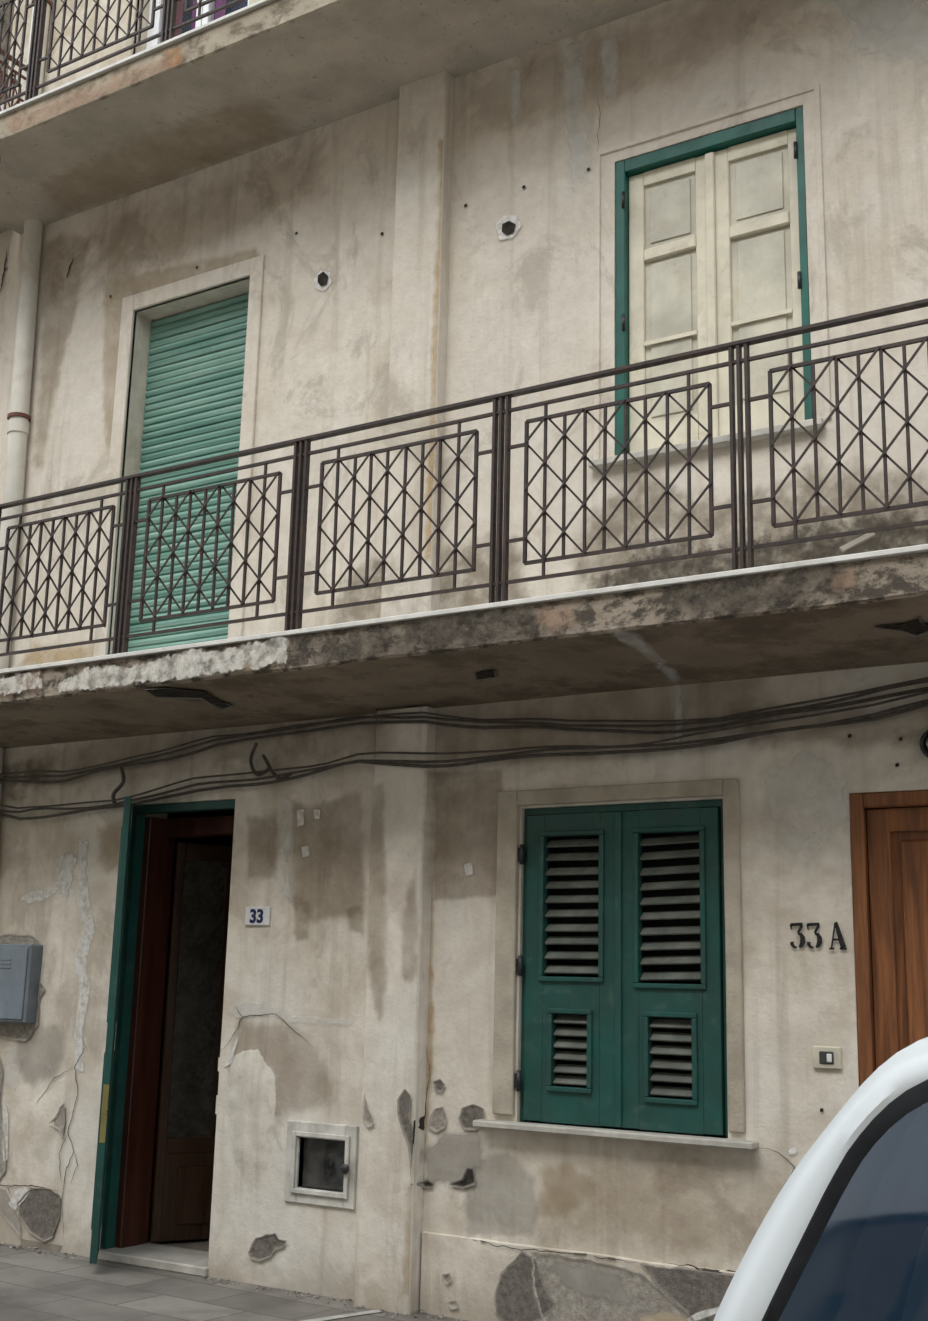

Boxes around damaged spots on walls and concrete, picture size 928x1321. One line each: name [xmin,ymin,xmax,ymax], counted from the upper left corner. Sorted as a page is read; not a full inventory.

leakage [600,515,928,612]
leakage [0,608,536,695]
crack [221,1008,310,1050]
flaking render [0,1062,60,1242]
flaking render [50,1104,65,1139]
flaking render [397,1079,485,1189]
flaking render [248,1234,286,1261]
flaking render [495,1251,734,1321]